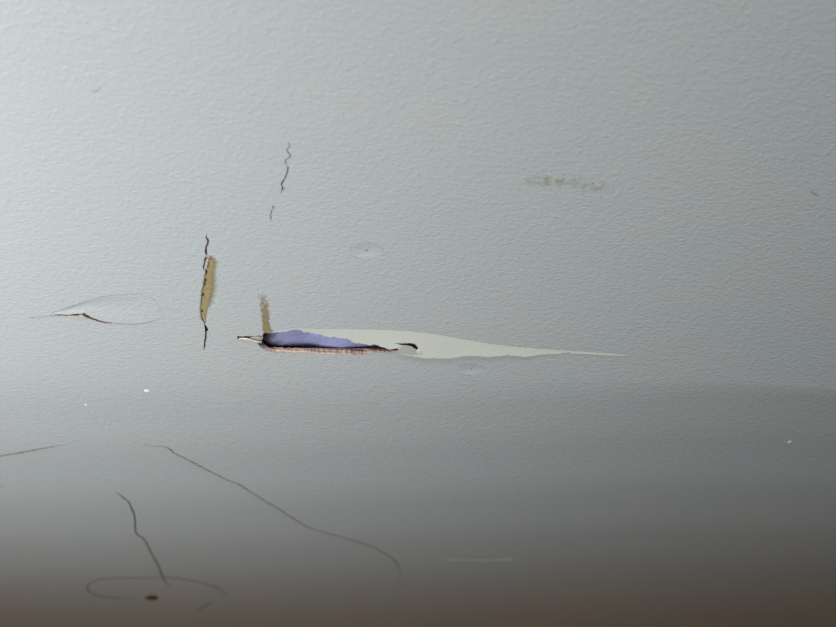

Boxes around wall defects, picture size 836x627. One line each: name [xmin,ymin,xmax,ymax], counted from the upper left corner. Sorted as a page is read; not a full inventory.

crack [199,234,216,348]
peeling [266,328,627,359]